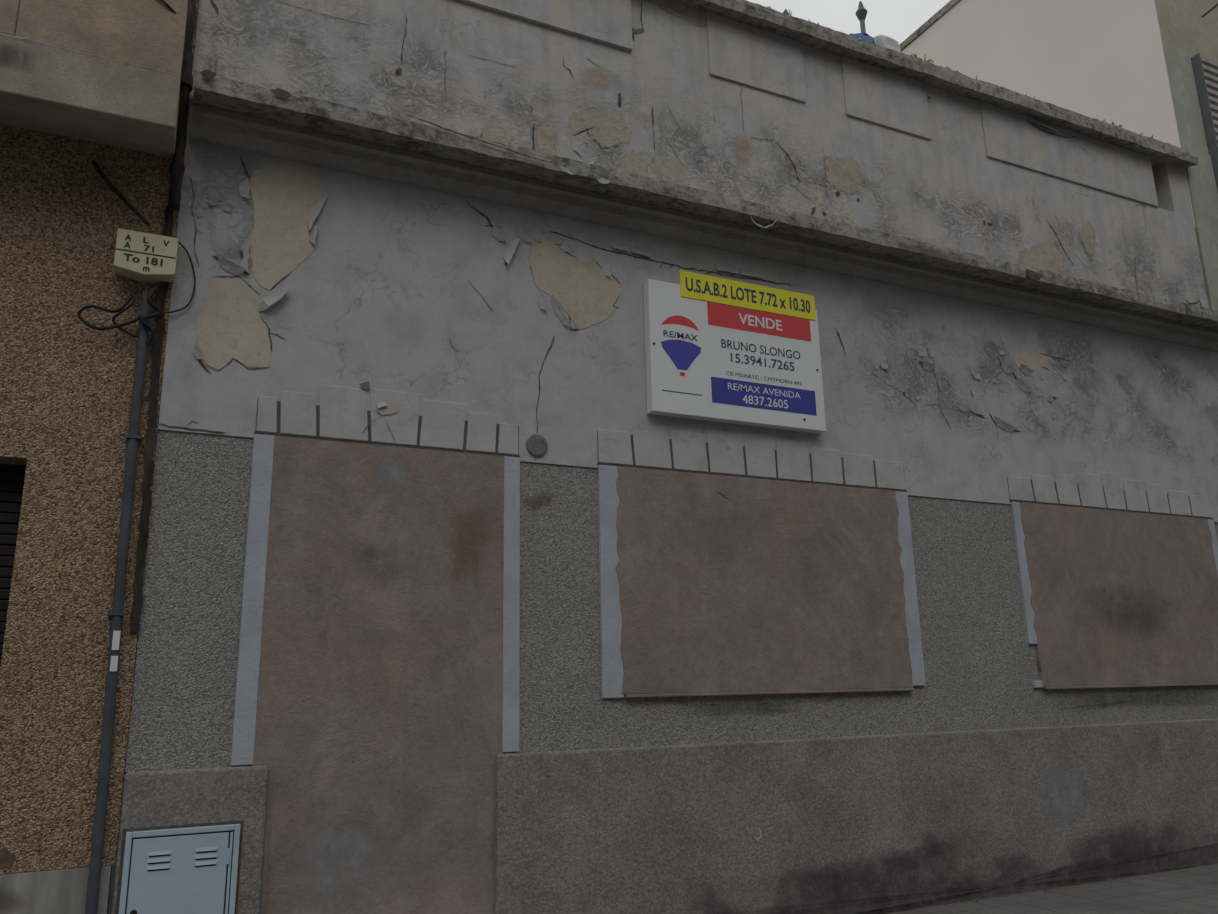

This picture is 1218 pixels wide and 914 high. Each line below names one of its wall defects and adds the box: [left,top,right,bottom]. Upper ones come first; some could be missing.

peeling [193,156,329,374]
peeling [517,225,622,331]
crack [536,334,555,434]